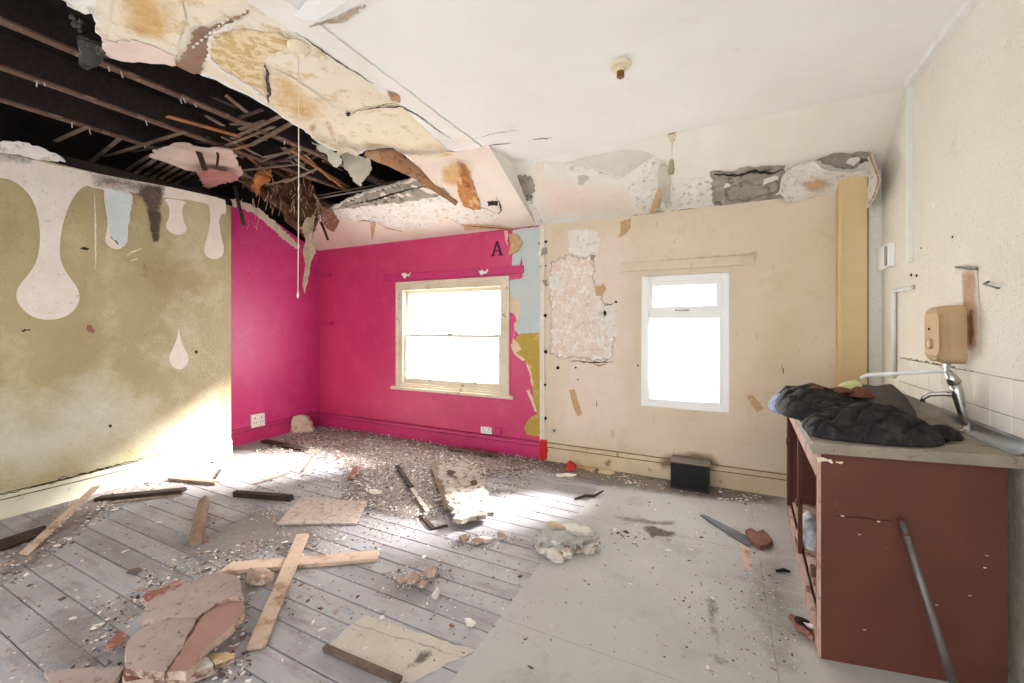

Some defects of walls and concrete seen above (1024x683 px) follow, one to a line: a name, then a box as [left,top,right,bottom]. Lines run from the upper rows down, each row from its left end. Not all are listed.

peeling [93,0,446,162]
flaking render [0,141,66,162]
flaking render [318,181,523,266]
water stain [436,151,476,188]
flaking render [517,174,535,201]
flaking render [546,150,881,213]
peeling [538,229,617,380]
rust [960,266,980,356]